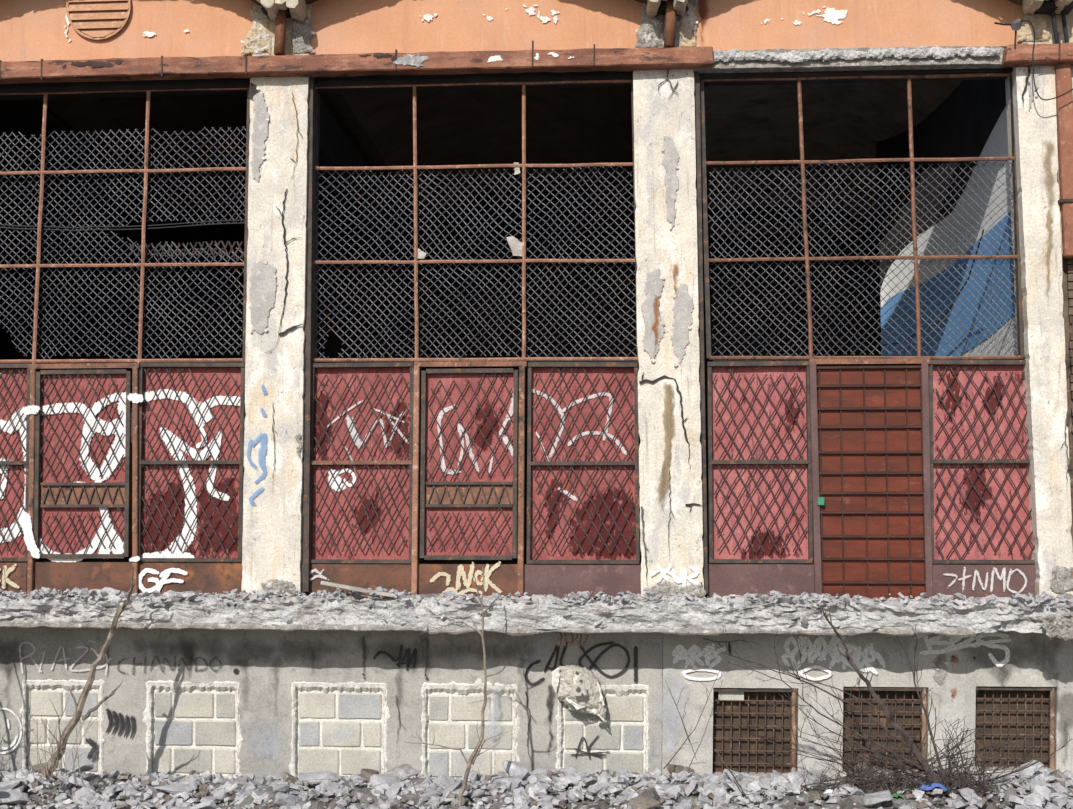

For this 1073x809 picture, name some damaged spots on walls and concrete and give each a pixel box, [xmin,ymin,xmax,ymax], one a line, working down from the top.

peeling [523,5,560,23]
peeling [761,6,848,25]
spalling [713,46,1000,62]
crack [260,93,303,356]
peeling [661,136,680,229]
peeling [641,268,694,366]
water stain [659,385,674,508]
crack [639,372,702,579]
spalling [1040,610,1073,642]